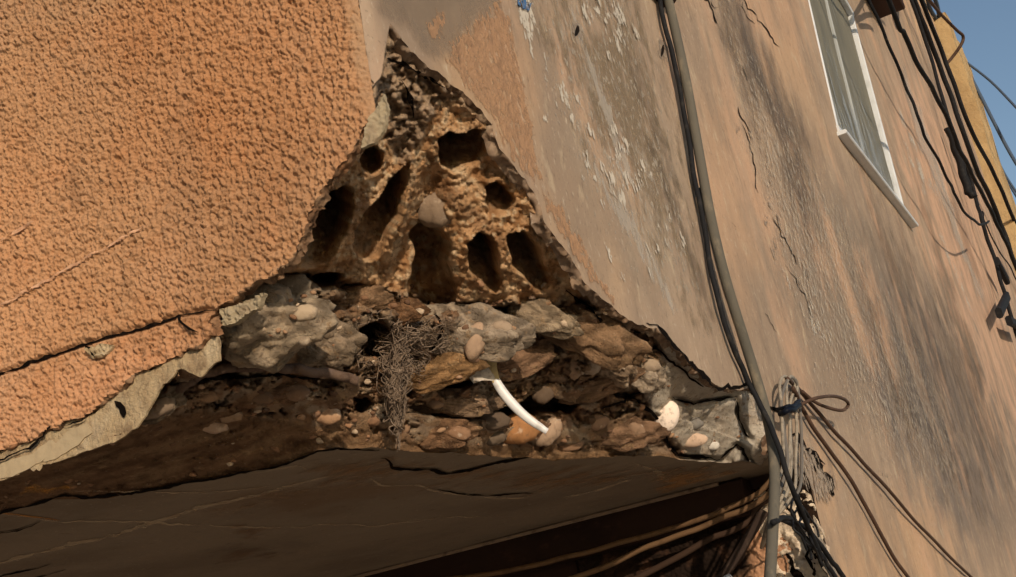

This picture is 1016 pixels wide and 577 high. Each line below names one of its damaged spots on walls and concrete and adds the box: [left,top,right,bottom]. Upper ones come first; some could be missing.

crack [742,1,778,46]
leakage [552,3,694,270]
crack [738,108,757,189]
leakage [737,5,806,216]
spalling [0,0,768,512]
crack [0,310,214,375]
crack [0,447,533,534]
spalling [754,491,768,536]
spalling [776,432,839,577]
crack [0,564,63,577]